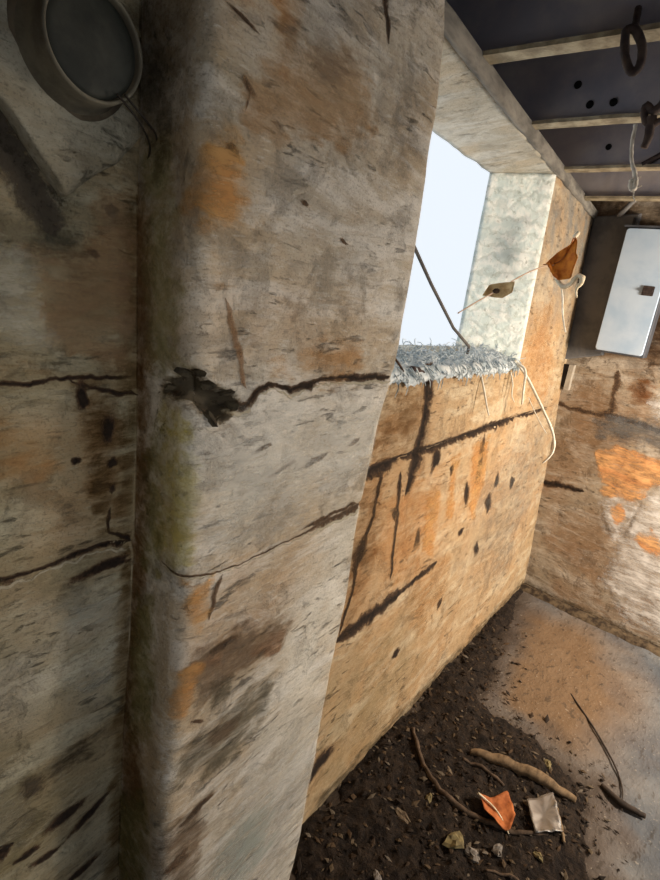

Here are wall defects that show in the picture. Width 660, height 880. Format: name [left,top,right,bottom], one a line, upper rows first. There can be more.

crack [0,374,138,397]
spalling [163,367,240,427]
crack [161,362,547,643]
crack [0,508,133,589]